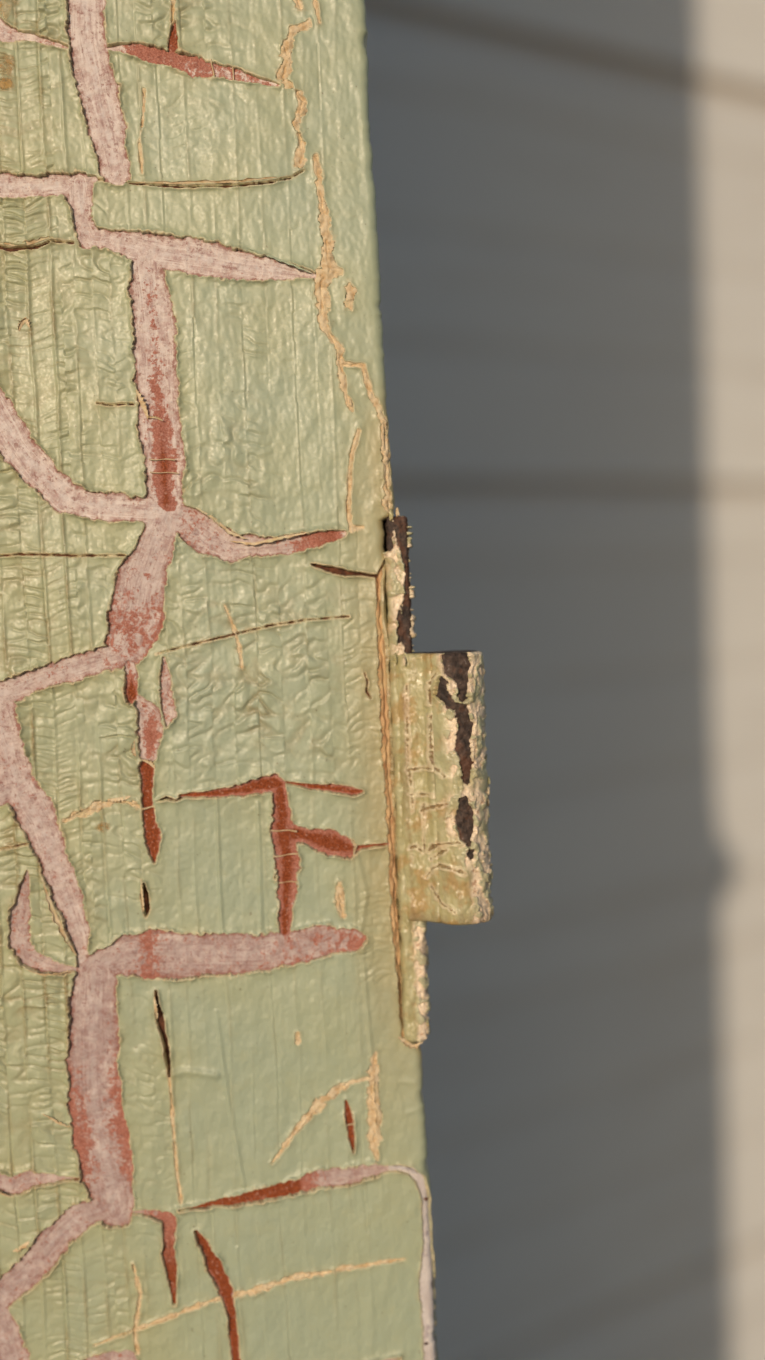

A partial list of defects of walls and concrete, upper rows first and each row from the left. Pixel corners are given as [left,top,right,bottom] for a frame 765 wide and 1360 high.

peeling [277,0,400,533]
crack [0,0,419,1360]
rust [383,516,413,653]
rust [436,652,474,860]
peeling [367,1052,436,1360]